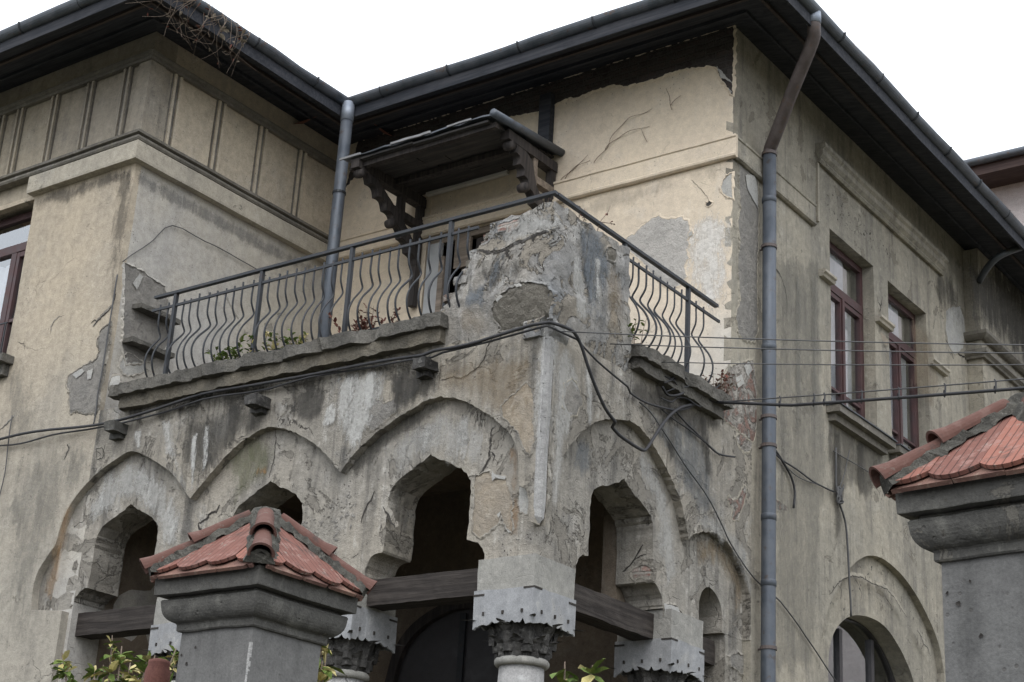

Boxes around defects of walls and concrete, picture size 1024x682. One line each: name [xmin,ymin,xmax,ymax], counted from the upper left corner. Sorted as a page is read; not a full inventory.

flaking render [345,25,738,192]
flaking render [495,216,523,236]
peeling [626,213,694,291]
peeling [65,262,171,416]
flaking render [490,279,558,333]
damp [130,383,273,483]
damp [287,353,440,446]
crack [475,426,495,475]
flaking render [722,358,759,454]